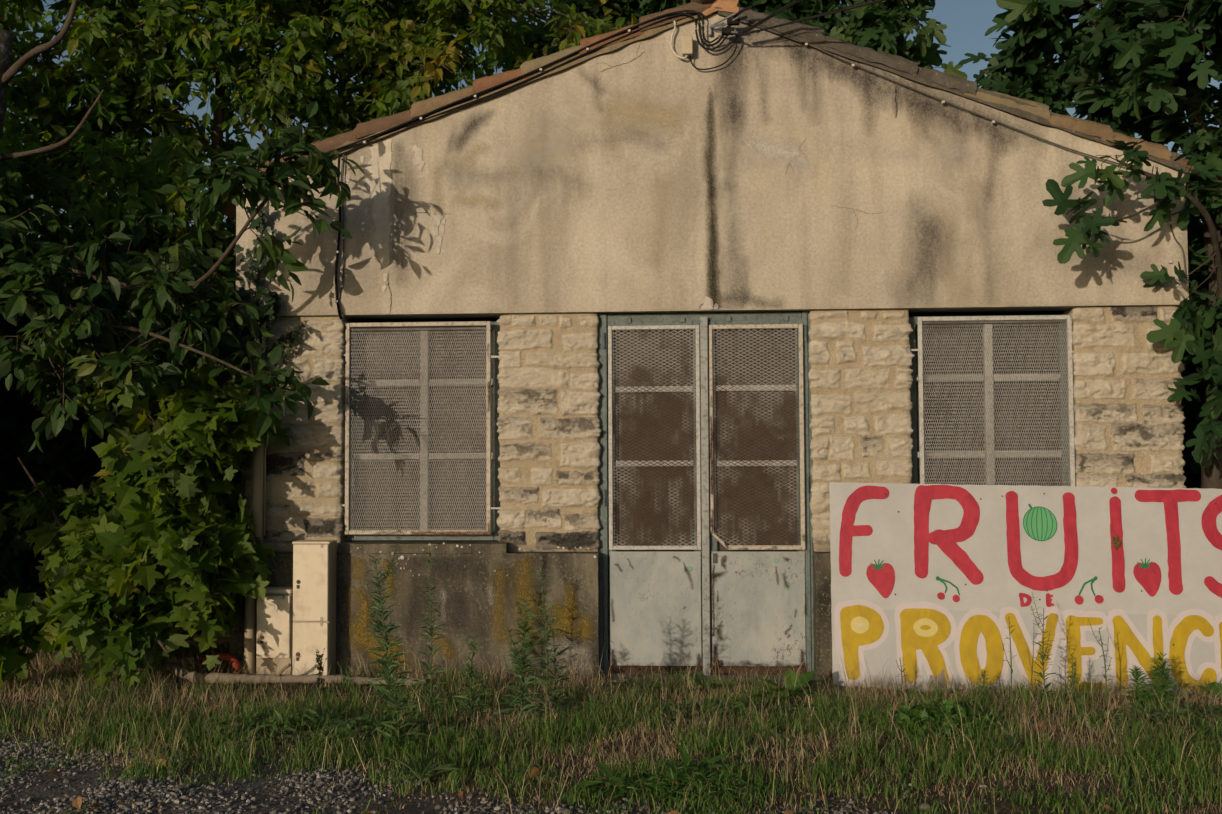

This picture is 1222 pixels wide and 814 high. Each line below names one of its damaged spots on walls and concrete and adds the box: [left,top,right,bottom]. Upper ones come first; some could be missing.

peeling [346,138,393,292]
water stain [708,110,716,307]